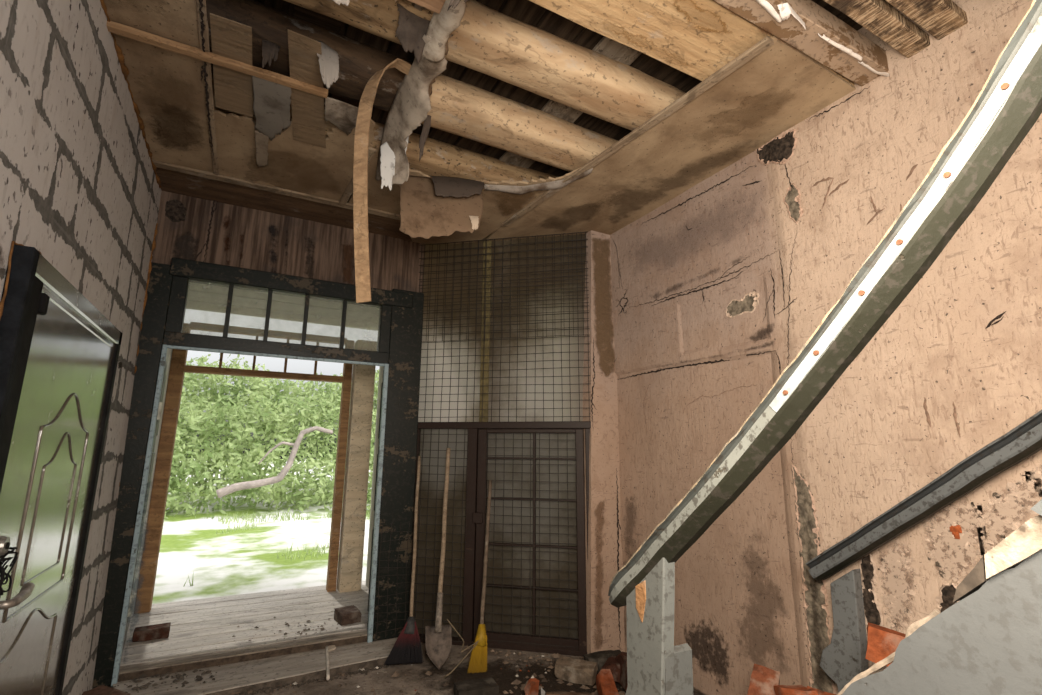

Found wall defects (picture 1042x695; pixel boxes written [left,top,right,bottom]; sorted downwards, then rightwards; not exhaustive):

spalling [756,129,797,166]
crack [591,234,797,432]
spalling [725,291,759,318]
peeling [859,468,1042,638]